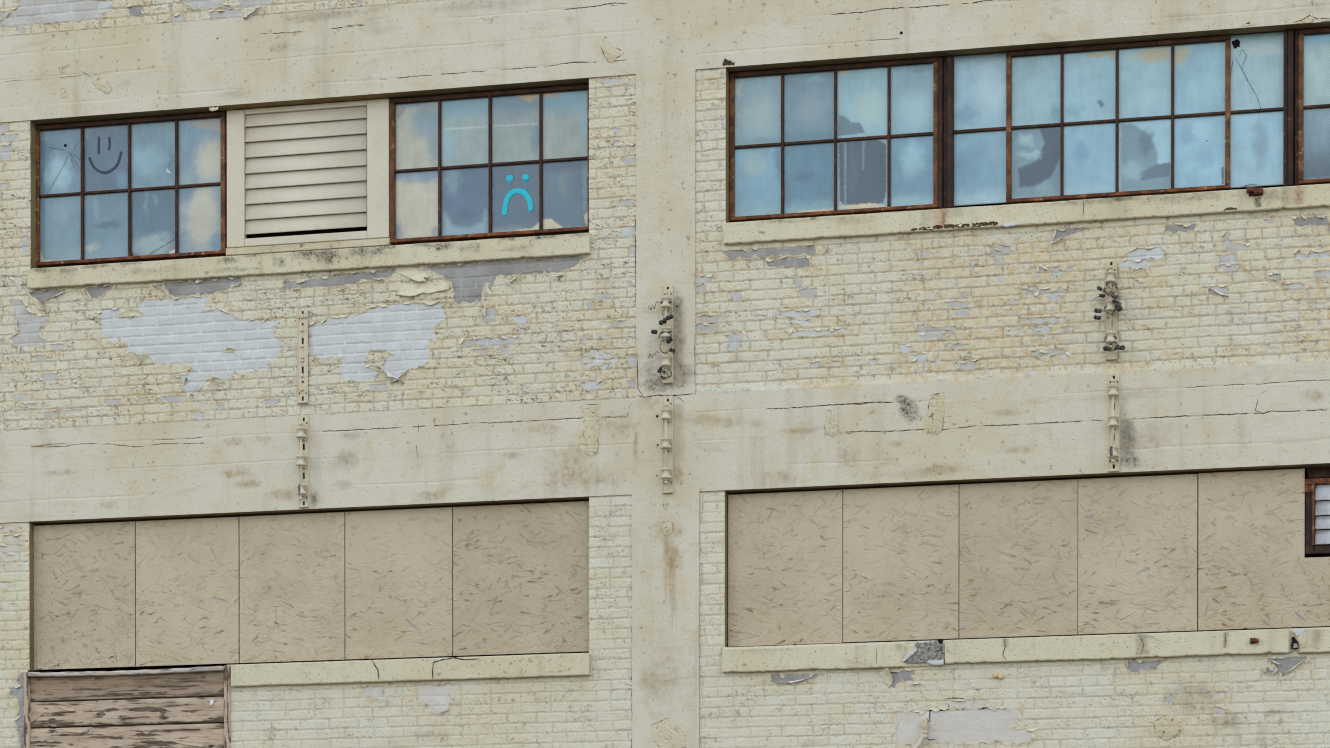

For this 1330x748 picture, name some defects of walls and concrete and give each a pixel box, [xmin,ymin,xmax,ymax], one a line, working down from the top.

peeling [0,0,144,35]
peeling [172,0,279,23]
spalling [905,221,1018,279]
peeling [1120,223,1198,274]
peeling [1203,230,1252,311]
peeling [1265,214,1330,234]
peeling [0,276,283,420]
peeling [281,255,587,399]
peeling [1005,266,1075,360]
spalling [879,640,945,689]
peeling [1264,628,1309,678]
peeling [894,695,1038,748]